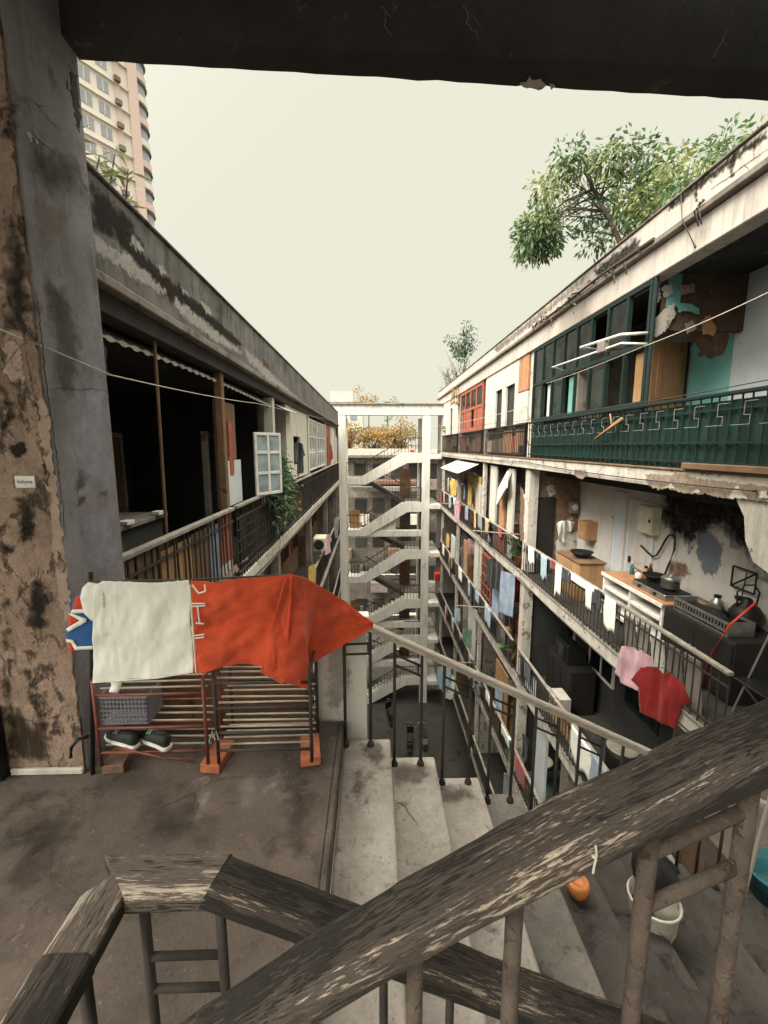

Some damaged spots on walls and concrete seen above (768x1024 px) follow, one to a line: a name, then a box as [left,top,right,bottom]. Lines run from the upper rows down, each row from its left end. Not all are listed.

spalling [520,77,555,90]
damp [2,226,38,327]
damp [90,184,241,346]
peeling [654,282,730,359]
peeling [3,340,30,382]
damp [0,388,15,429]
damp [10,442,26,458]
spalling [645,472,768,502]
damp [15,494,35,540]
mould [26,581,51,629]
damp [2,678,48,760]